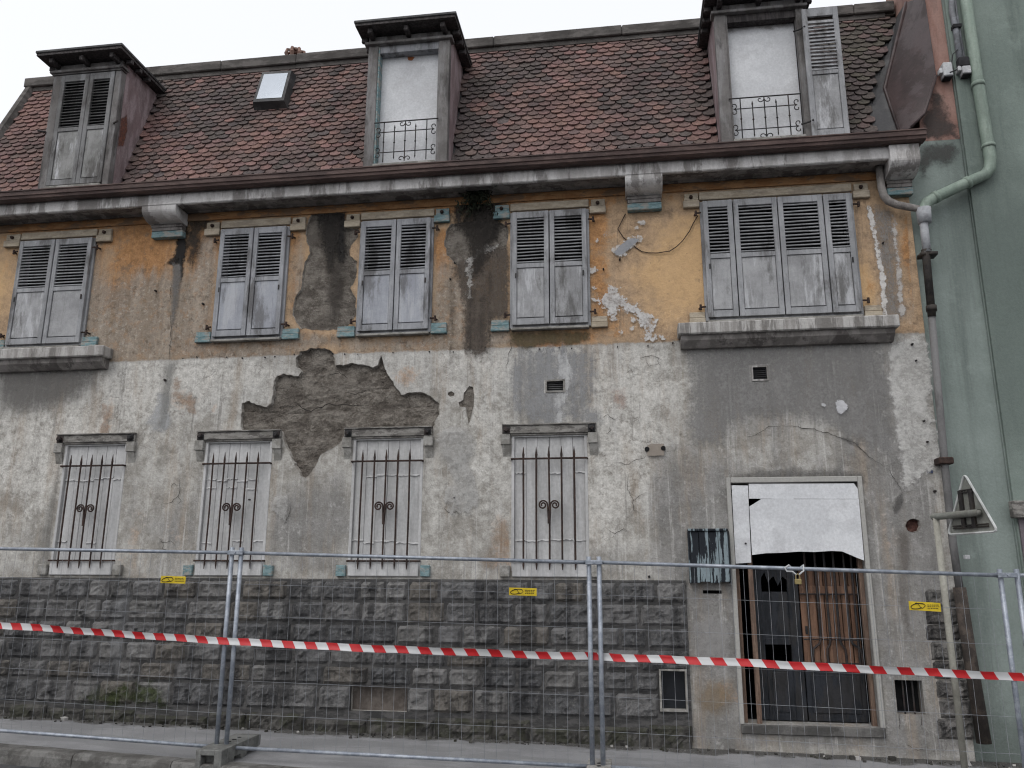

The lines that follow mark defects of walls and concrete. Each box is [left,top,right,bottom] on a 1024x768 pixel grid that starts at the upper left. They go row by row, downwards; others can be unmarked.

water stain [168,221,210,323]
spalling [292,213,359,331]
water stain [454,203,510,357]
peeling [596,220,645,257]
peeling [590,266,665,342]
water stain [867,206,906,316]
spalling [241,348,474,478]
crack [749,425,900,487]
peeling [821,400,848,414]
spalling [905,519,920,532]